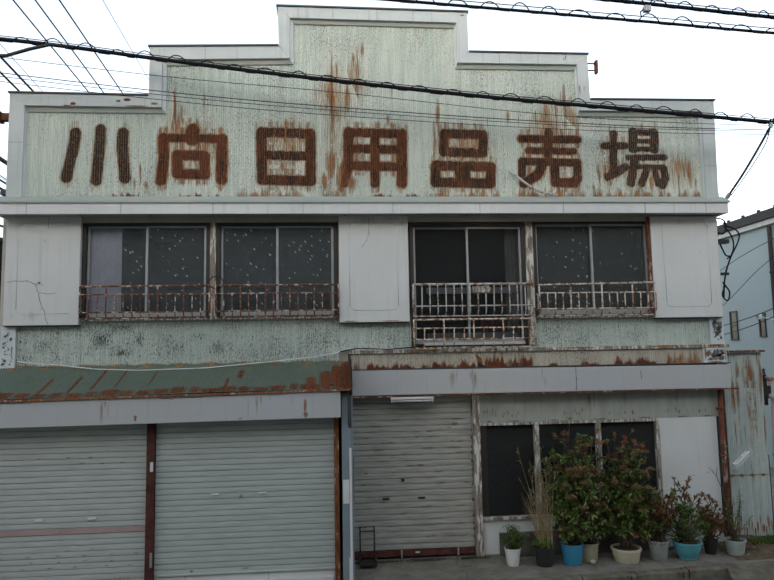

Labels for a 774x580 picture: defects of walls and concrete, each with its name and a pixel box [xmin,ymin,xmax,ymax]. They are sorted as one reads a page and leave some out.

rust [238,45,420,197]
rust [430,100,499,197]
rust [516,87,700,197]
rust [0,360,357,418]
rust [367,353,533,370]
rust [615,356,656,365]
rust [655,344,726,363]
rust [730,355,766,443]